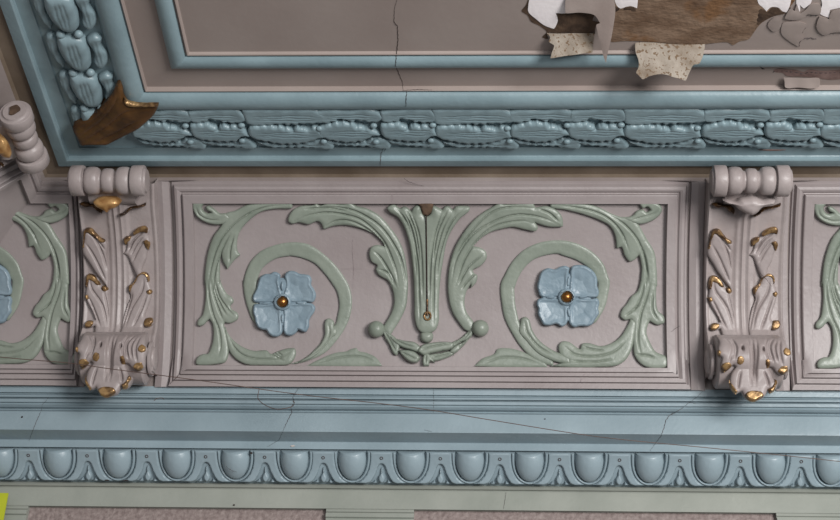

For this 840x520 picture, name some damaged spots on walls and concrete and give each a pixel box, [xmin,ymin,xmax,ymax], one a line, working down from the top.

crack [394,1,423,96]
flaking render [522,0,840,81]
peeling [773,68,840,89]